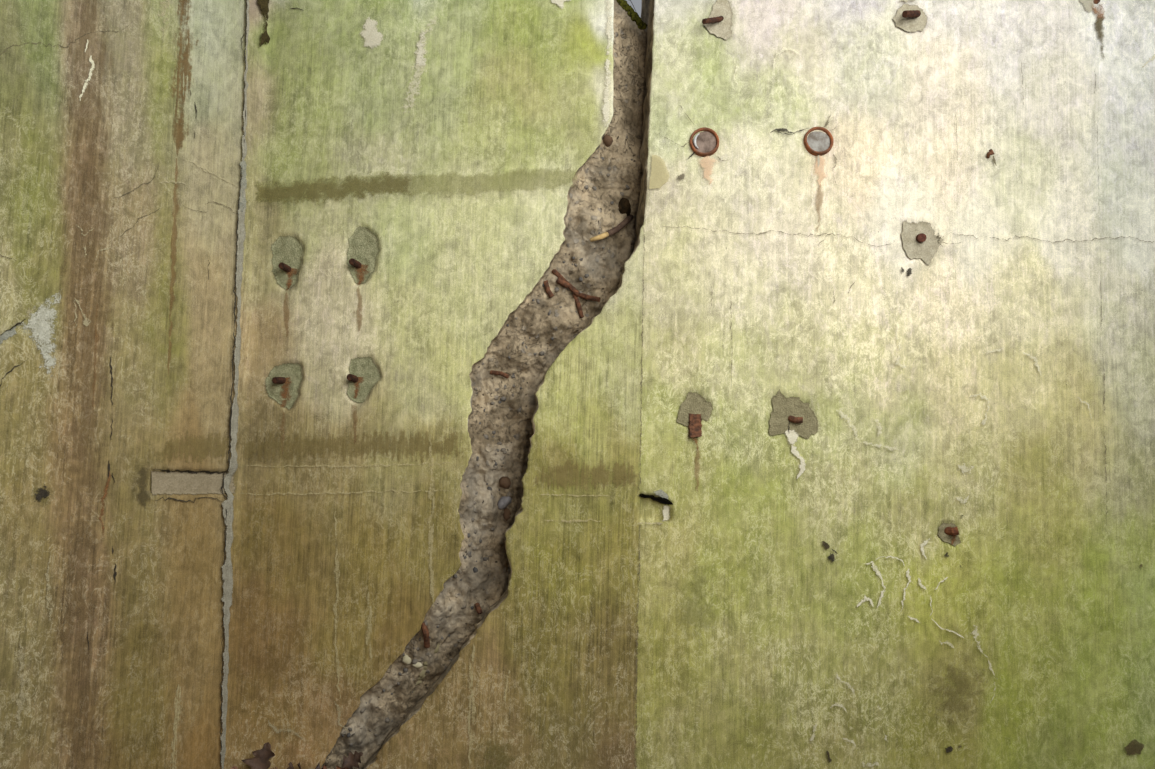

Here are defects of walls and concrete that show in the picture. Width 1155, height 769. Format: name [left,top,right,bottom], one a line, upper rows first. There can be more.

spalling [901,220,943,265]
crack [937,232,1154,246]
spalling [21,293,61,374]
crack [321,0,912,769]
spalling [769,389,818,439]